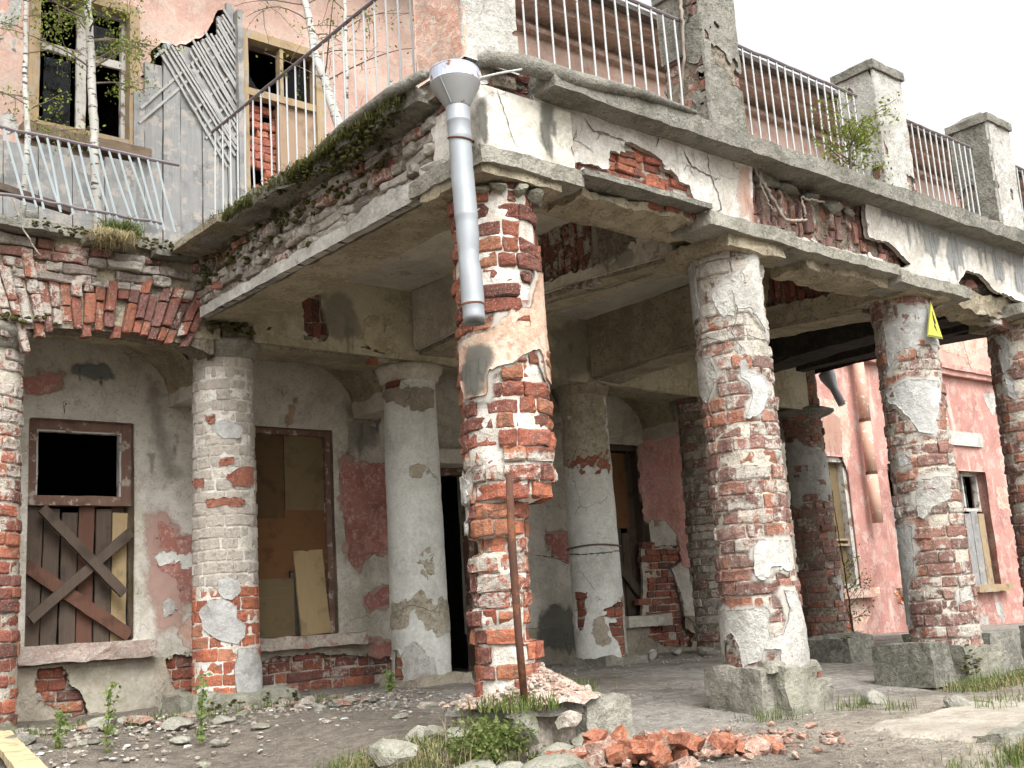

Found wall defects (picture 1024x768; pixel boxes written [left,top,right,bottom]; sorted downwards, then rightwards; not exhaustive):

crack [571,119,628,163]
spalling [575,144,692,198]
crack [656,136,743,212]
spalling [752,181,904,267]
water stain [72,363,114,385]
peeling [736,342,772,419]
peeling [338,454,388,573]
peeling [459,472,473,541]
peeling [575,436,693,657]
peeling [894,450,952,631]
peeling [718,535,810,667]
spalling [35,667,85,716]